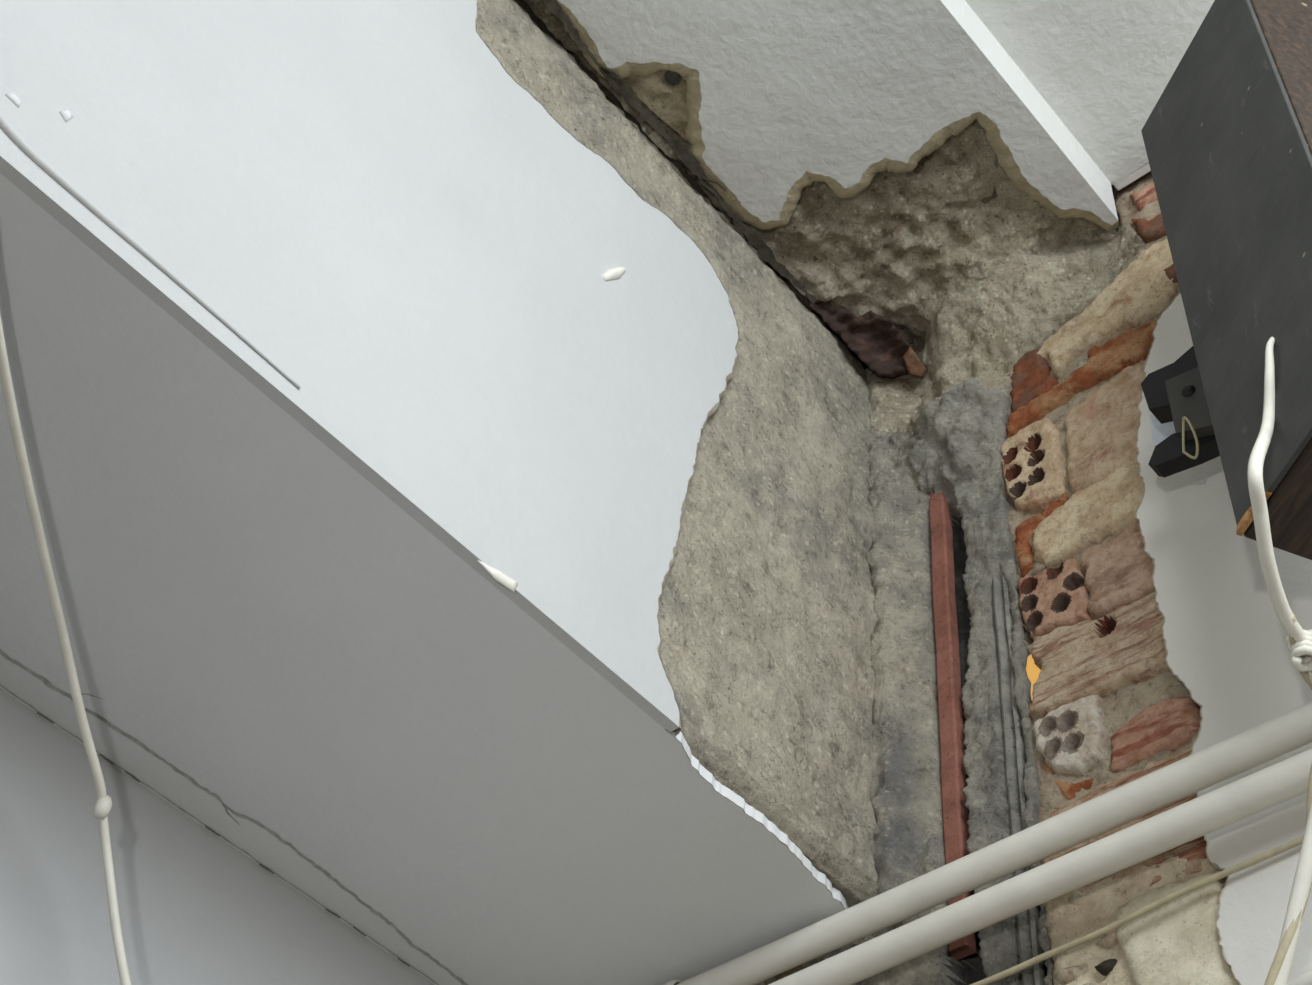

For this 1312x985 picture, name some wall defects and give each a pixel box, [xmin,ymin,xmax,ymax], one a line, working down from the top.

corrosion [803,285,927,379]
spalling [476,0,1203,909]
crack [0,649,468,985]
spalling [764,901,948,985]
spalling [853,915,1022,985]
peeling [1037,835,1241,985]